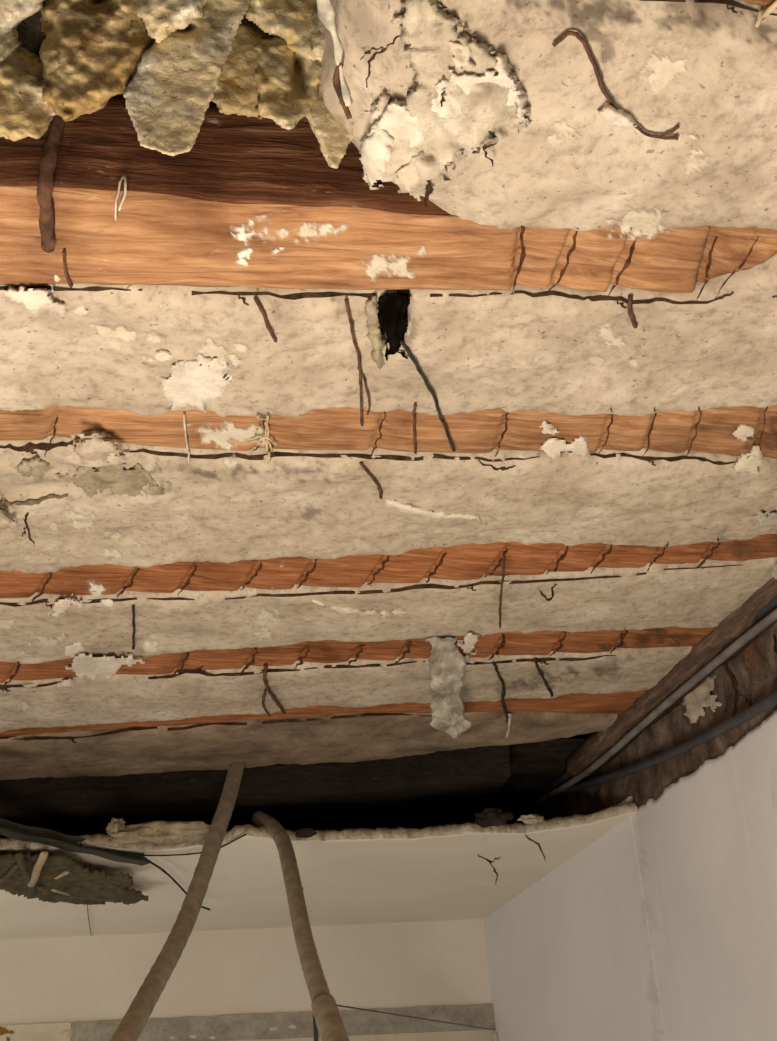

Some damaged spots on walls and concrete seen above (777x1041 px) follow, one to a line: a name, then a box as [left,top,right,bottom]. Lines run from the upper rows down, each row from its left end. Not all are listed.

flaking render [358,0,533,207]
peeling [237,248,253,266]
flaking render [4,275,89,316]
hole [364,293,410,370]
flaking render [142,331,247,413]
flaking render [539,420,589,461]
flaking render [732,424,764,476]
spalling [17,456,172,506]
flaking render [47,594,84,618]
flaking render [56,641,159,687]
flaking render [456,633,485,662]
crack [478,855,501,884]